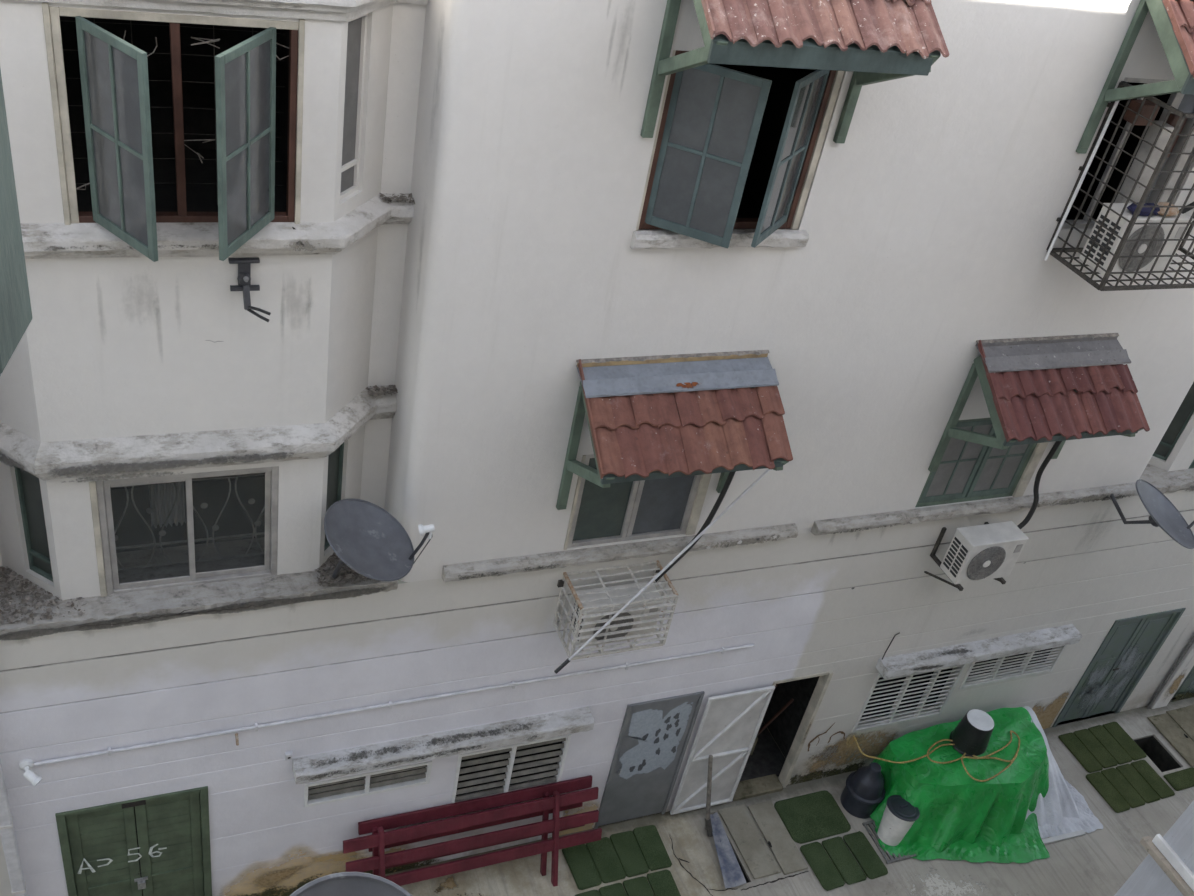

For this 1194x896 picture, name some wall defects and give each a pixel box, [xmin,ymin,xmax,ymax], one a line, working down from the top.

damp [228,854,357,896]